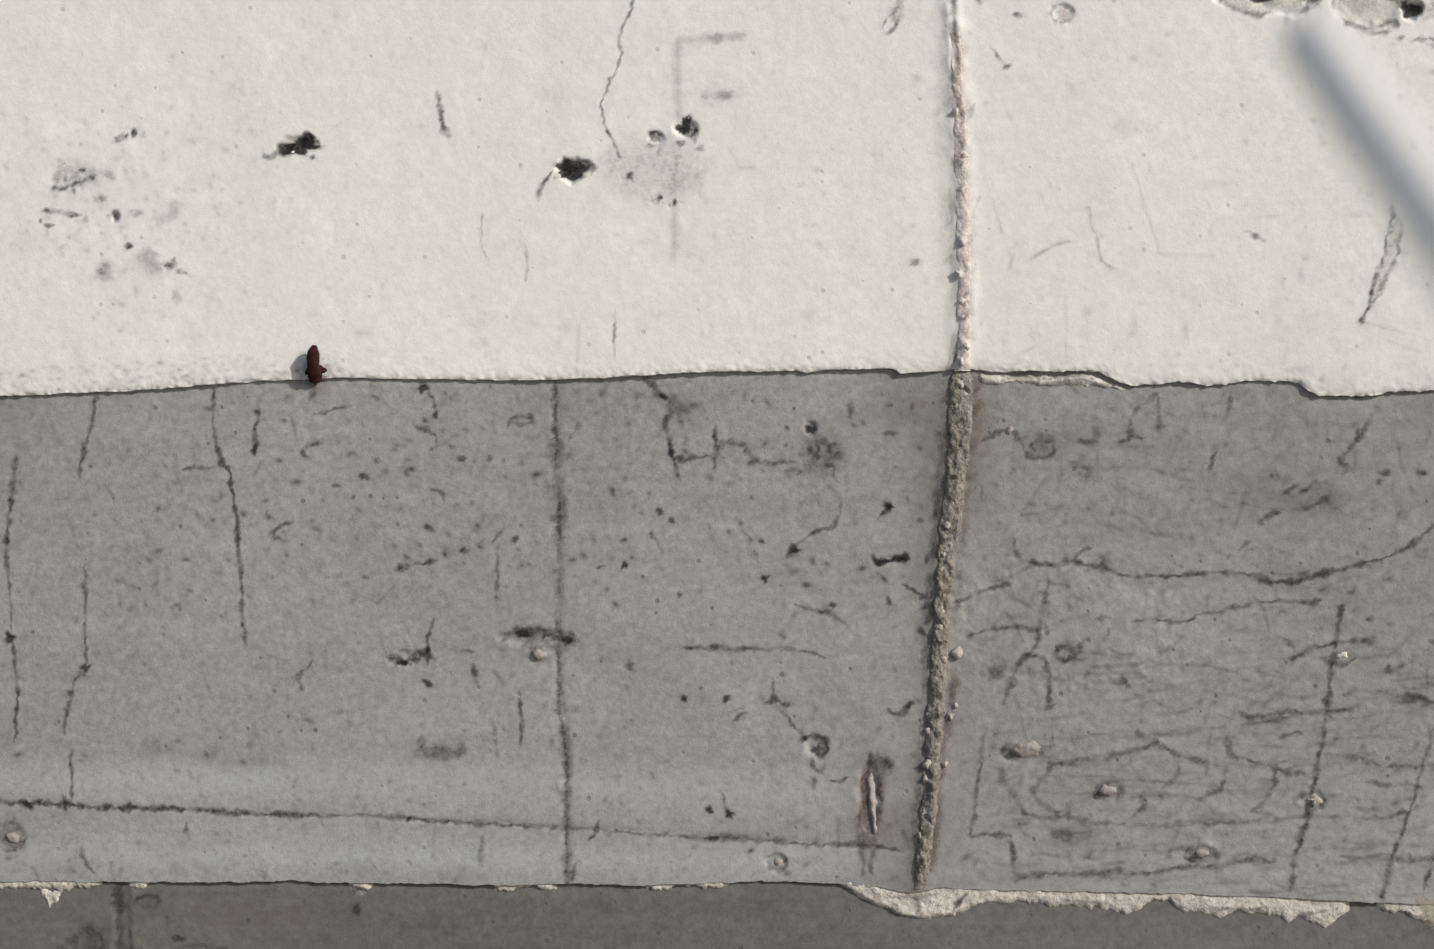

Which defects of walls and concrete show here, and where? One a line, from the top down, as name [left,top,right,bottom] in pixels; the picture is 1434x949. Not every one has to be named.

spalling [1371,0,1434,33]
hole [268,131,320,159]
spalling [649,115,698,146]
hole [539,159,595,192]
crack [647,380,784,476]
crack [185,422,258,639]
crack [4,458,20,733]
crack [888,532,1427,883]
crack [9,761,336,818]
crack [407,816,528,828]
flaking render [840,753,1349,928]
flaking render [1376,903,1434,926]